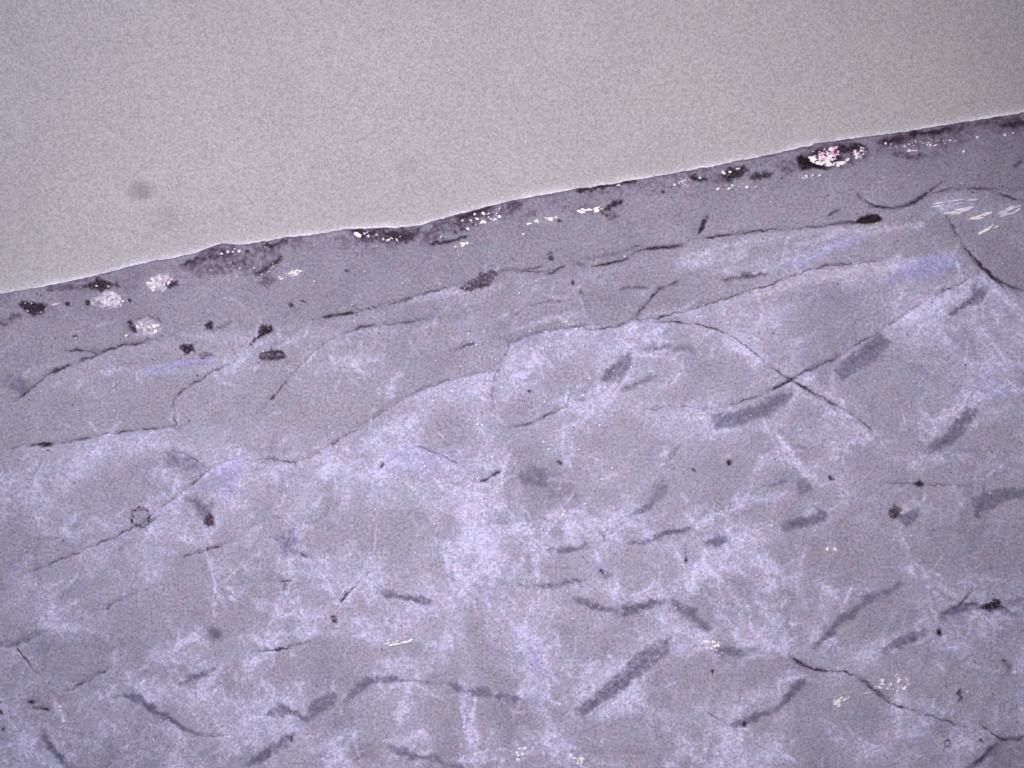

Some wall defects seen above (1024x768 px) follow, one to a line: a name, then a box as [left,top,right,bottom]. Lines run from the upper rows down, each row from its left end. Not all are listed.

crack [865,183,942,209]
crack [699,216,767,239]
crack [597,246,676,266]
crack [965,249,1015,289]
crack [650,291,755,354]
crack [774,369,834,405]
crack [793,658,870,688]